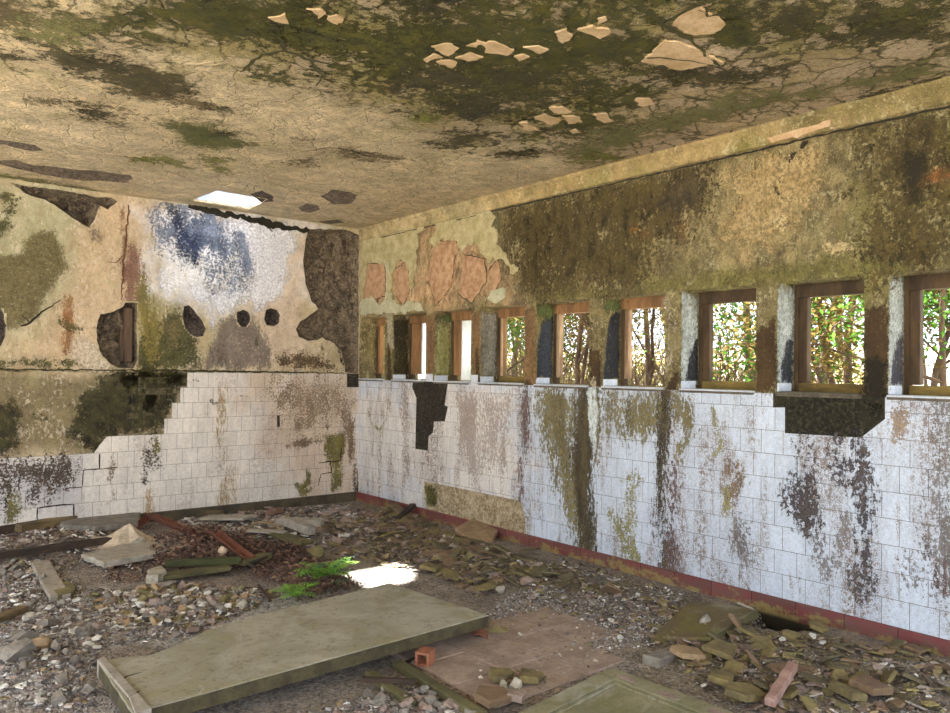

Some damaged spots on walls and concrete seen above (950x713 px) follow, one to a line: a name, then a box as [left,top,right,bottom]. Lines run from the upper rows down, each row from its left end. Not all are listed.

flaking render [641,6,726,70]
flaking render [11,183,117,227]
peeling [63,302,199,453]
damp [147,202,359,450]
flaking render [296,210,519,387]
peeling [412,381,448,451]
damp [450,137,835,573]
crack [457,105,950,220]
peeling [773,393,885,438]
damp [821,109,950,413]
damp [775,424,881,606]
damp [896,401,950,610]